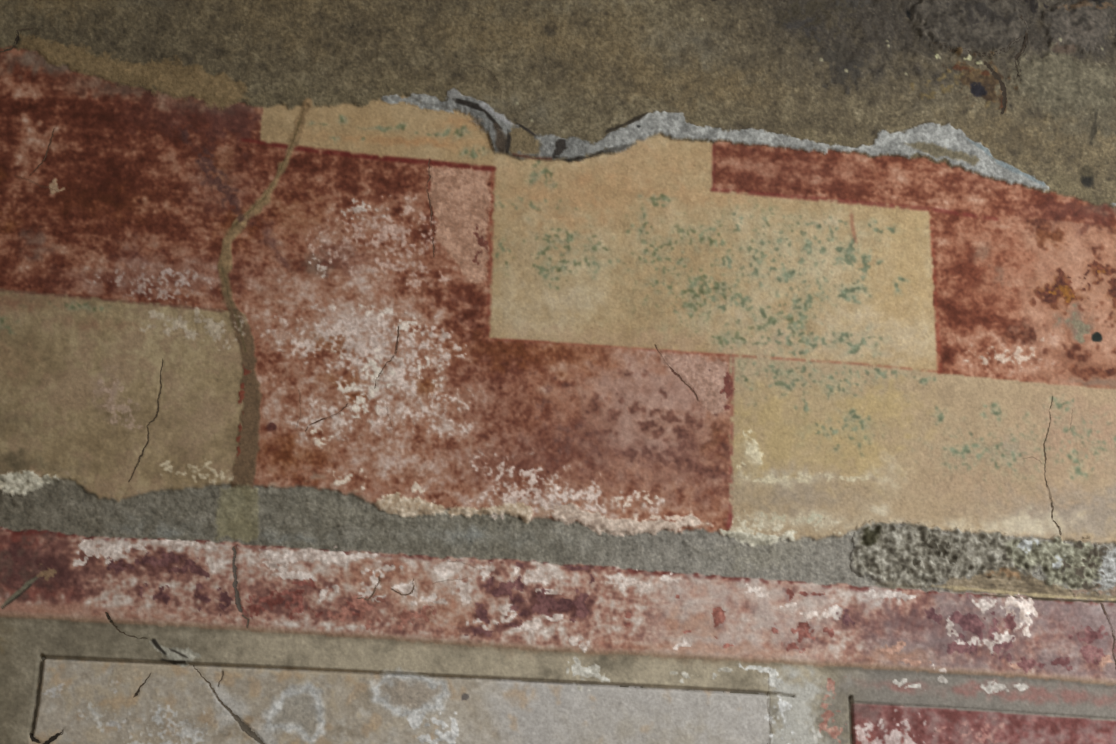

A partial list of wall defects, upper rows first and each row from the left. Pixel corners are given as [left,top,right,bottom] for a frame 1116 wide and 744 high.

spalling [378,84,1051,193]
leakage [305,188,458,293]
crack [211,96,315,628]
leakage [84,260,481,454]
spalling [0,468,73,498]
crack [130,358,163,480]
spalling [373,491,534,525]
spalling [550,501,798,549]
crack [1023,398,1072,538]
leakage [106,548,437,632]
leakage [459,560,602,638]
crack [193,665,265,744]